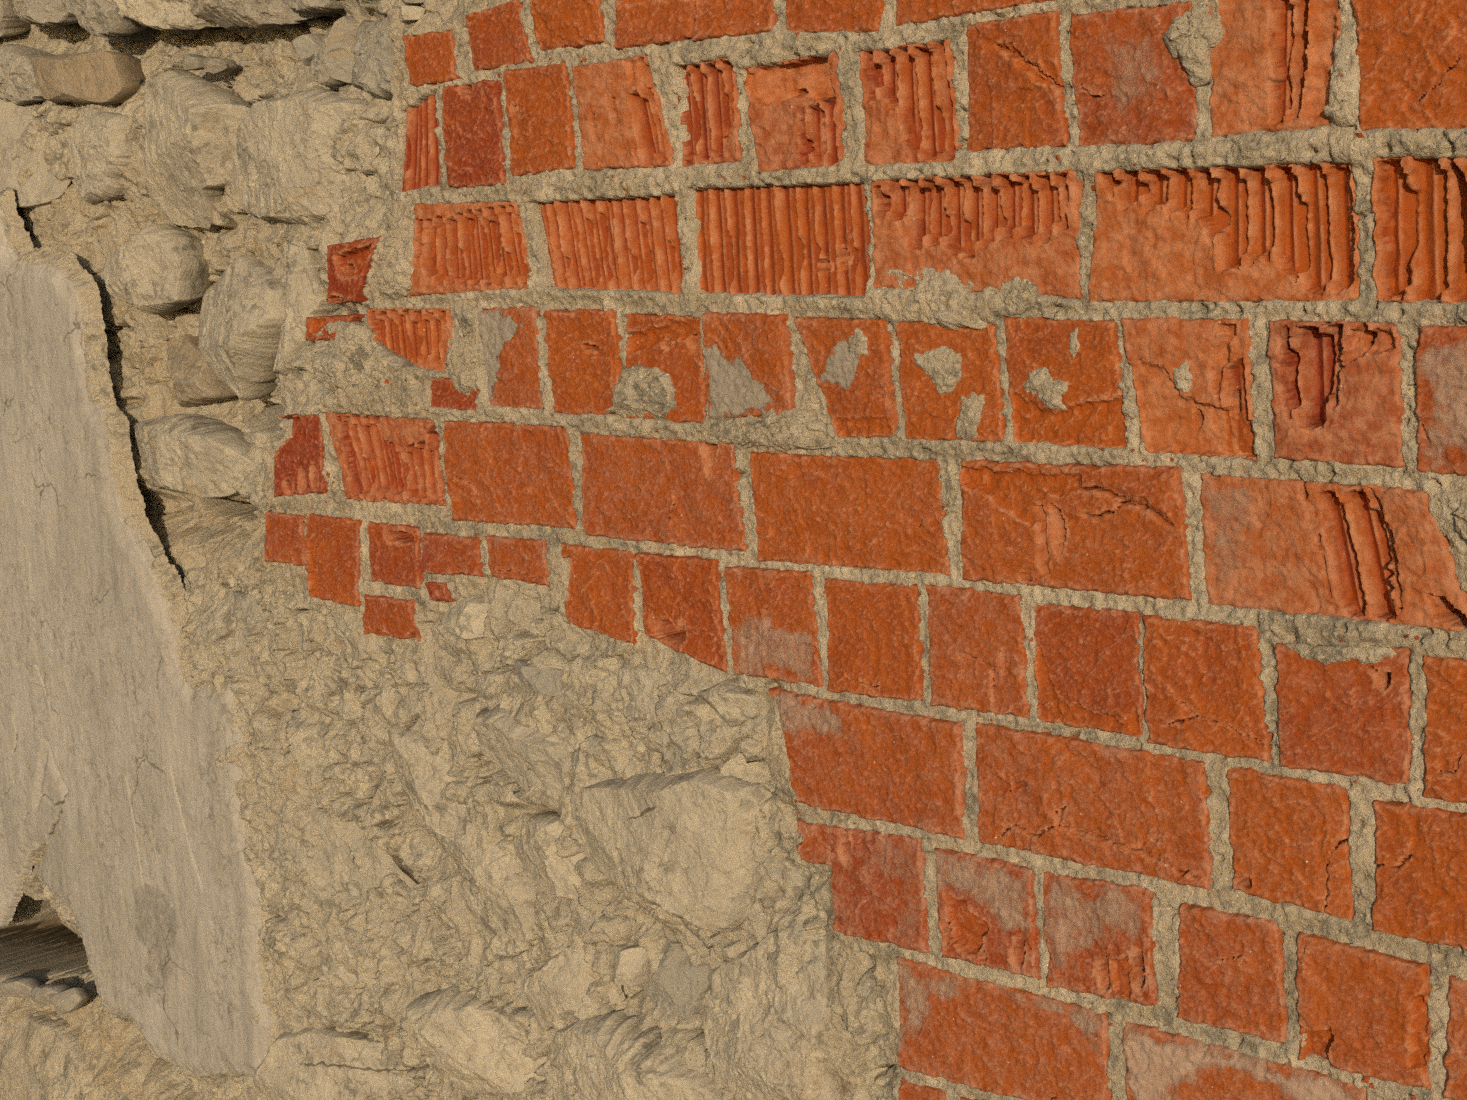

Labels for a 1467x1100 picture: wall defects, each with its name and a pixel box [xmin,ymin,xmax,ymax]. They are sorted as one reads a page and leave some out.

spalling [305,91,532,373]
spalling [462,0,1467,738]
spalling [274,412,457,641]
spalling [769,686,1158,1006]
spalling [1295,931,1432,1090]